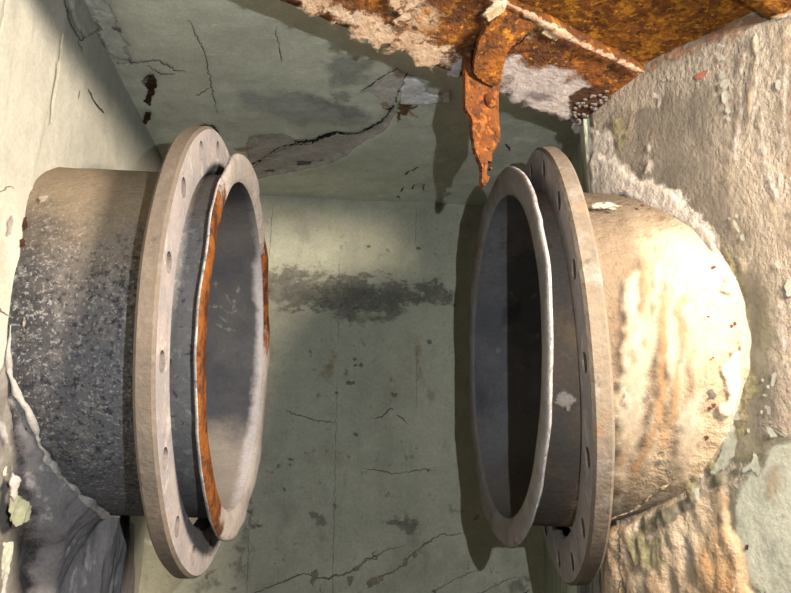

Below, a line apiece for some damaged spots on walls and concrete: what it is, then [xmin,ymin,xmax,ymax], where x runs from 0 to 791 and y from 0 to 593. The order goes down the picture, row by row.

spalling [84,0,132,66]
spalling [142,74,157,125]
crack [189,21,218,114]
spalling [234,106,397,179]
crack [252,68,407,168]
corrosion [397,101,418,120]
corrosion [649,16,761,72]
leakage [268,265,454,322]
crack [246,365,464,593]